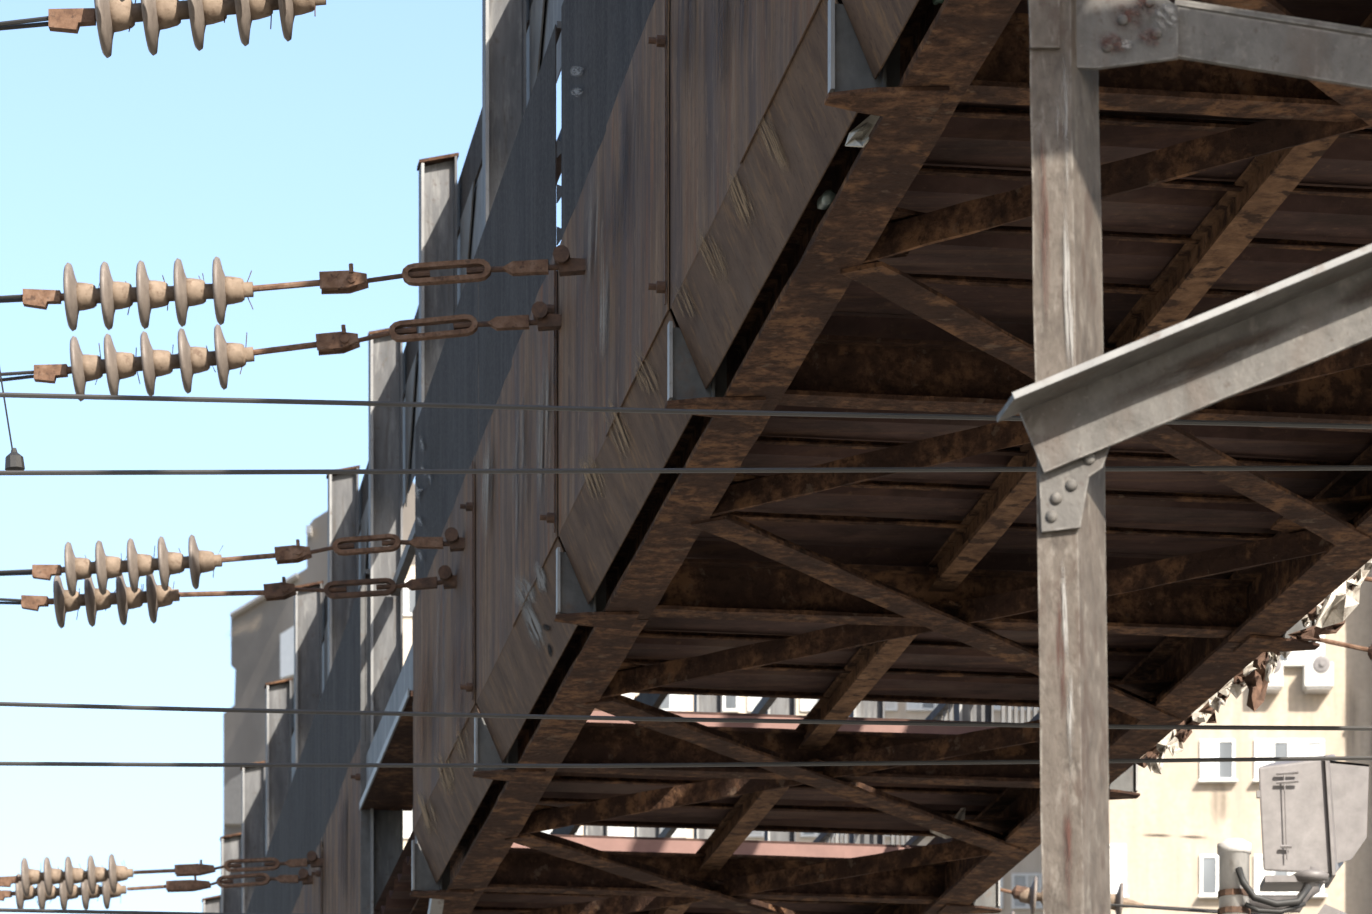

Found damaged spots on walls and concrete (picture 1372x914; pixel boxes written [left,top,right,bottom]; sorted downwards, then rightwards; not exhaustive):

peeling [1136,559,1372,775]